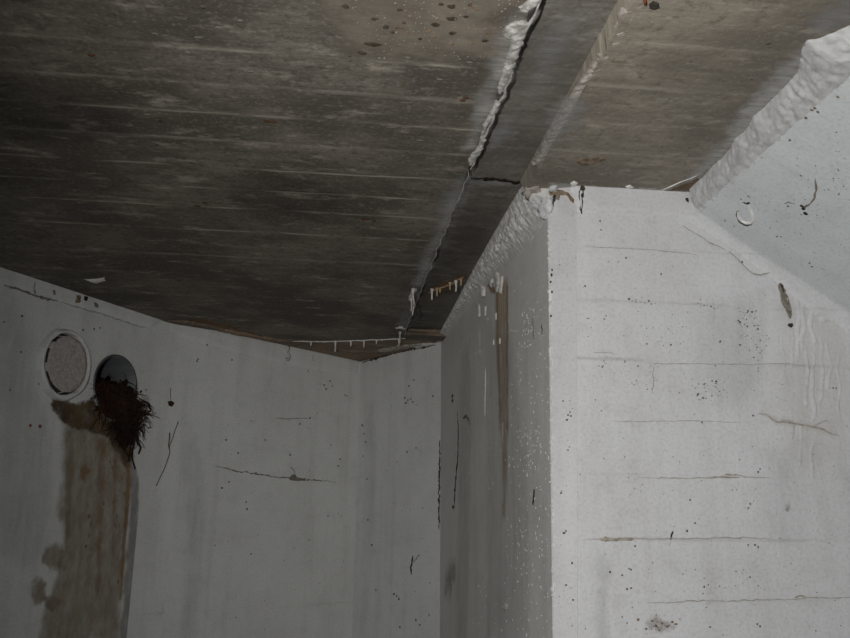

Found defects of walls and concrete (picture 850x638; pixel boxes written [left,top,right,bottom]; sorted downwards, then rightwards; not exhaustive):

water stain [691,56,802,180]
crack [471,177,521,185]
crack [767,414,839,439]
crack [438,394,470,528]
crack [216,466,332,482]
crack [586,531,772,546]